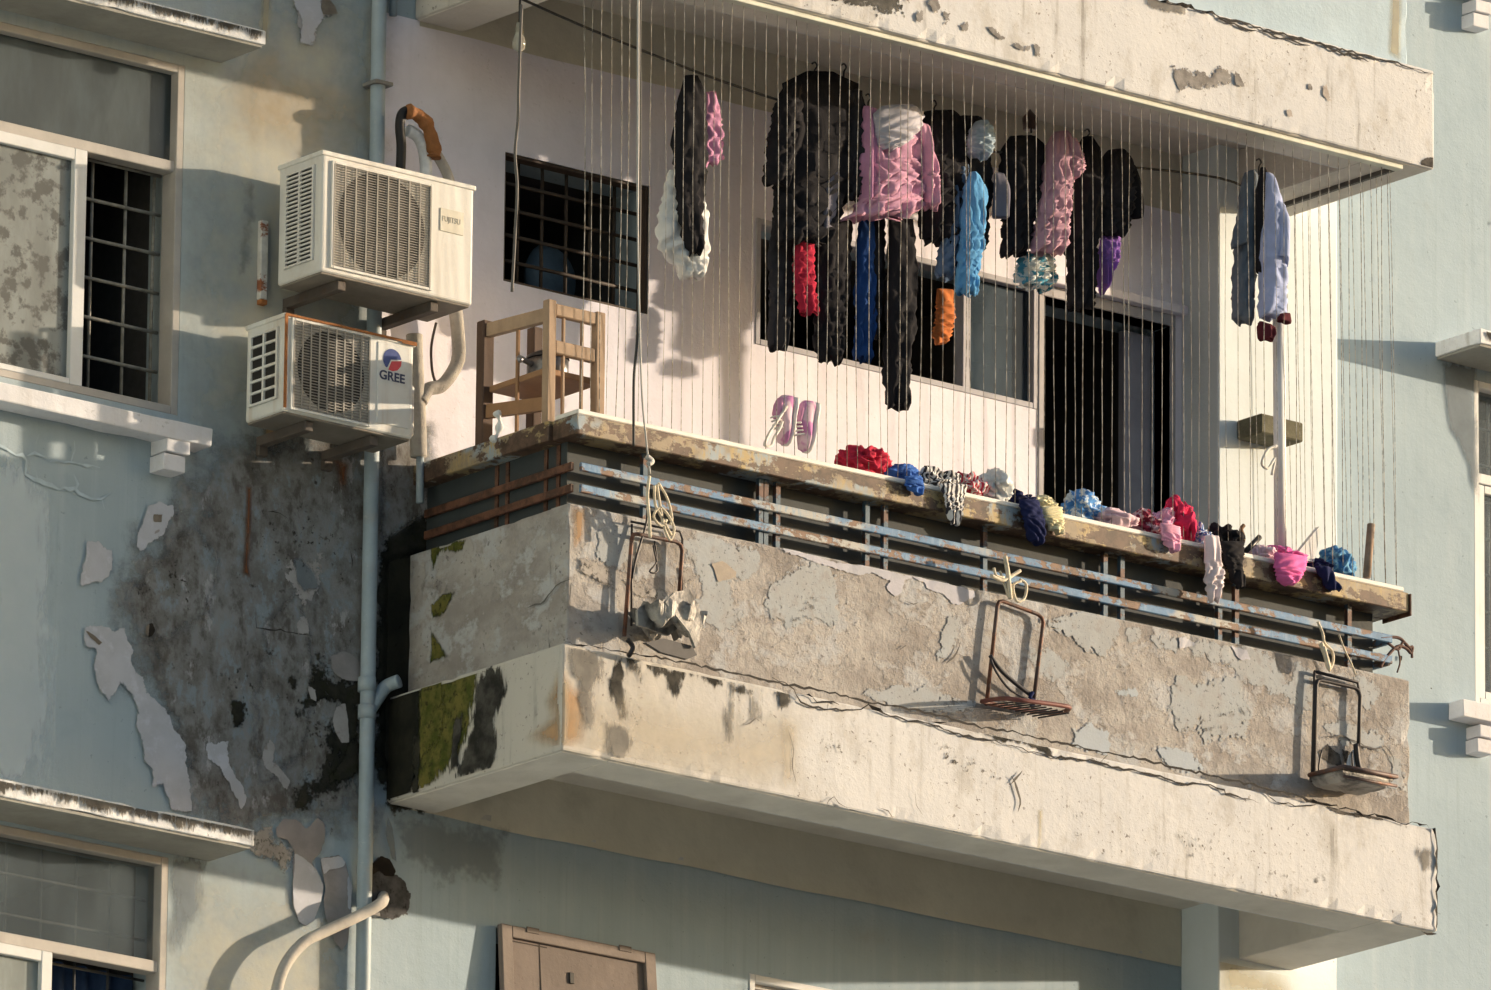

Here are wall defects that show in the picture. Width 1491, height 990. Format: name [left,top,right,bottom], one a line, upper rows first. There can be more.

water stain [0,424,432,840]
crack [528,579,571,608]
peeling [580,523,975,662]
peeling [84,625,192,812]
peeling [206,741,247,809]
water stain [449,666,507,778]
water stain [568,647,790,758]
peeling [863,684,976,717]
crack [570,642,1440,935]
peeling [1026,611,1407,792]
peeling [250,818,352,950]
spalling [372,819,411,920]